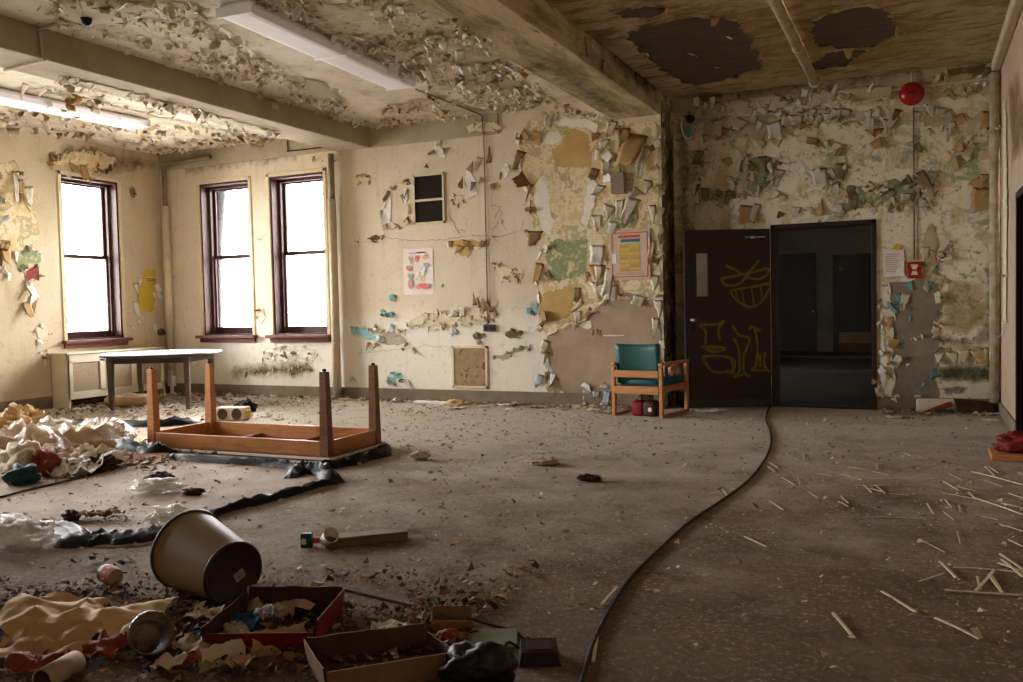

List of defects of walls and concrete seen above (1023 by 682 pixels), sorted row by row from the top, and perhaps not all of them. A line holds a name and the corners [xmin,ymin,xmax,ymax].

peeling [0,0,665,406]
peeling [608,2,1008,403]
water stain [939,366,989,393]